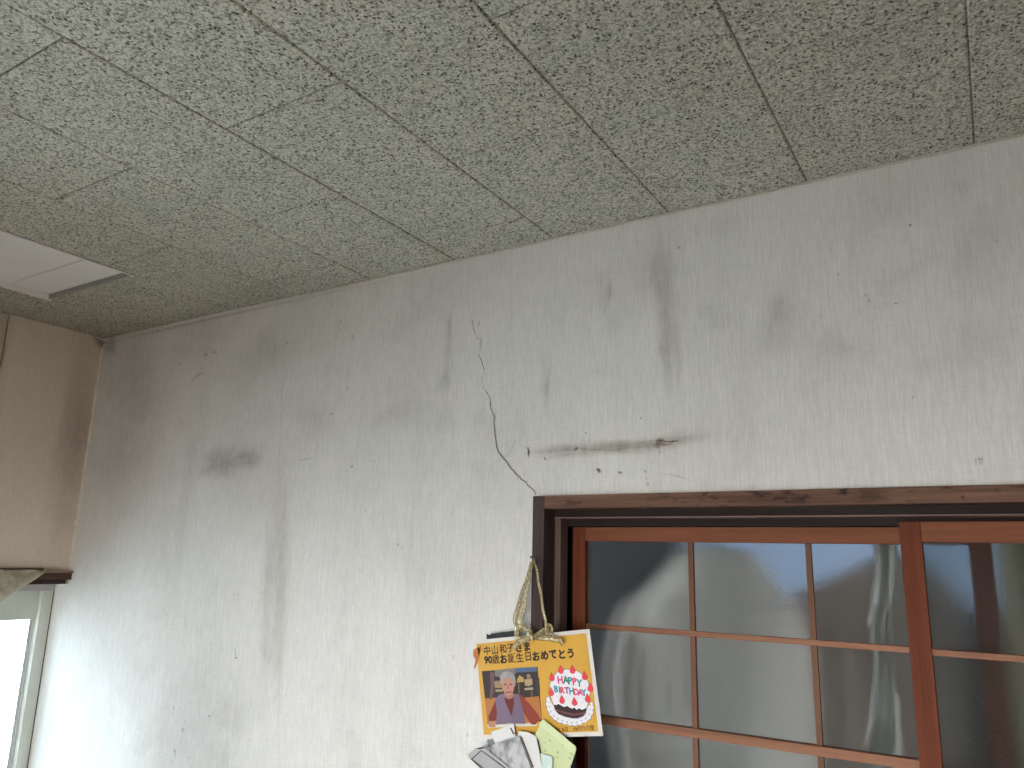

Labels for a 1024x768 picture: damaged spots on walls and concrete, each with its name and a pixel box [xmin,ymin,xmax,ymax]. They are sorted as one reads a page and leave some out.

crack [472,321,536,494]